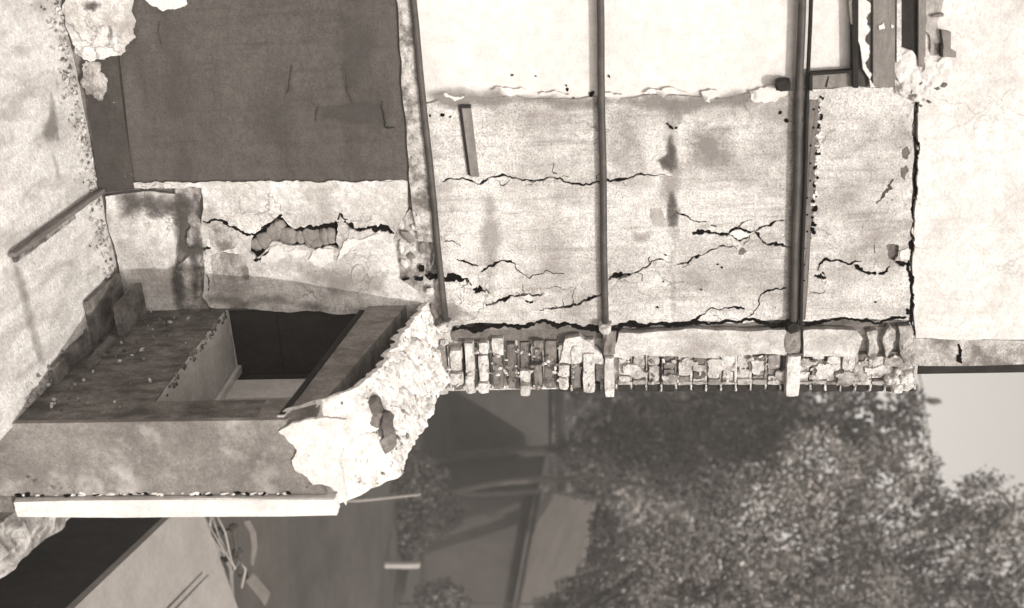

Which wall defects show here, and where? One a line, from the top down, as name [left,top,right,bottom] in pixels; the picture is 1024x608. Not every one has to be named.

peeling [62,0,187,101]
leakage [434,91,508,108]
leakage [630,94,751,225]
crack [188,213,394,291]
spalling [251,217,386,267]
crack [416,102,920,335]
peeling [279,416,347,505]
flaking render [368,395,397,454]